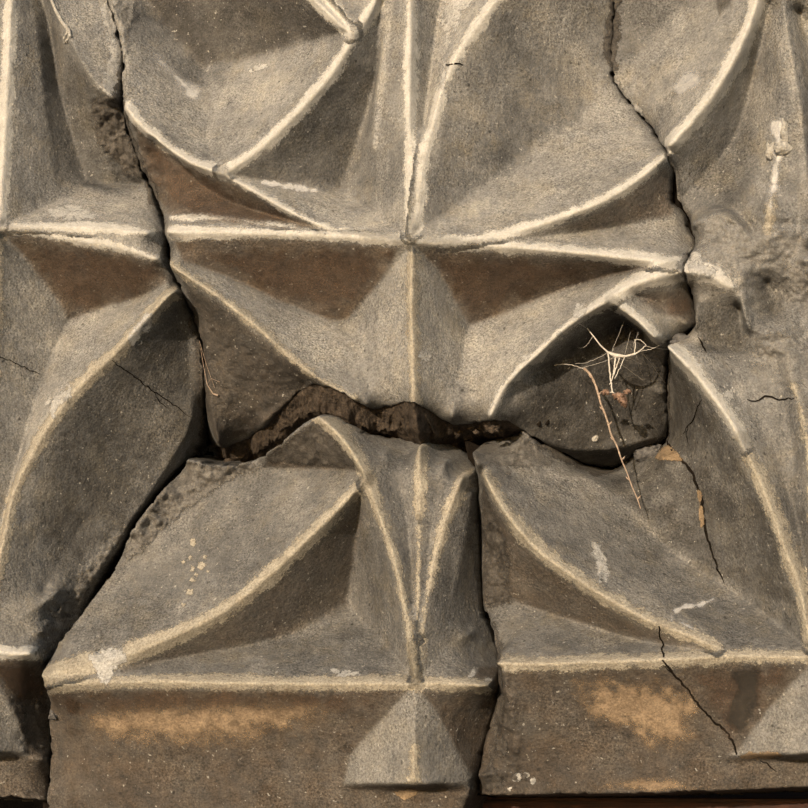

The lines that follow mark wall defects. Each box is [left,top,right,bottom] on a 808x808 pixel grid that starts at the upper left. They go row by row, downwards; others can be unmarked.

crack [99,0,164,219]
crack [602,0,695,300]
crack [106,315,207,581]
crack [465,440,480,466]
crack [532,437,633,477]
crack [658,351,724,582]
crack [747,394,794,402]
damp [587,679,697,746]